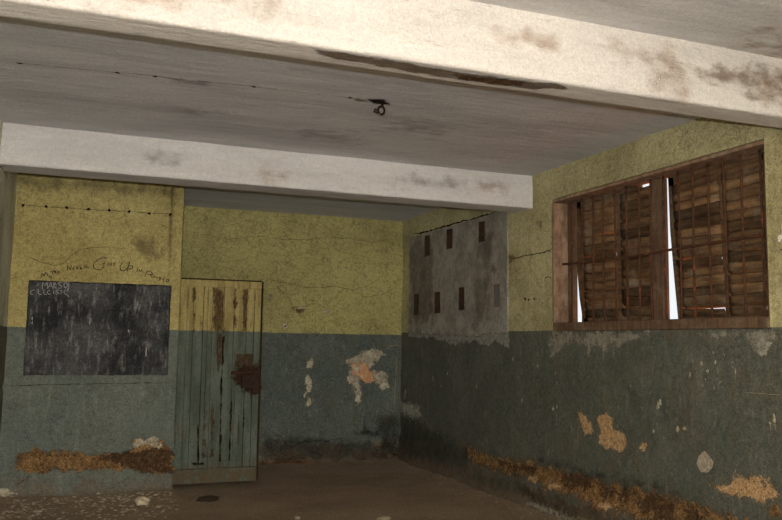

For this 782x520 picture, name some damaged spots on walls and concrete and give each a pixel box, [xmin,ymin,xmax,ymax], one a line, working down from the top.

crack [22,204,178,216]
peeling [303,358,314,406]
peeling [346,345,399,412]
flaking render [14,436,176,475]
peeling [576,411,627,453]
flaking render [465,441,782,520]